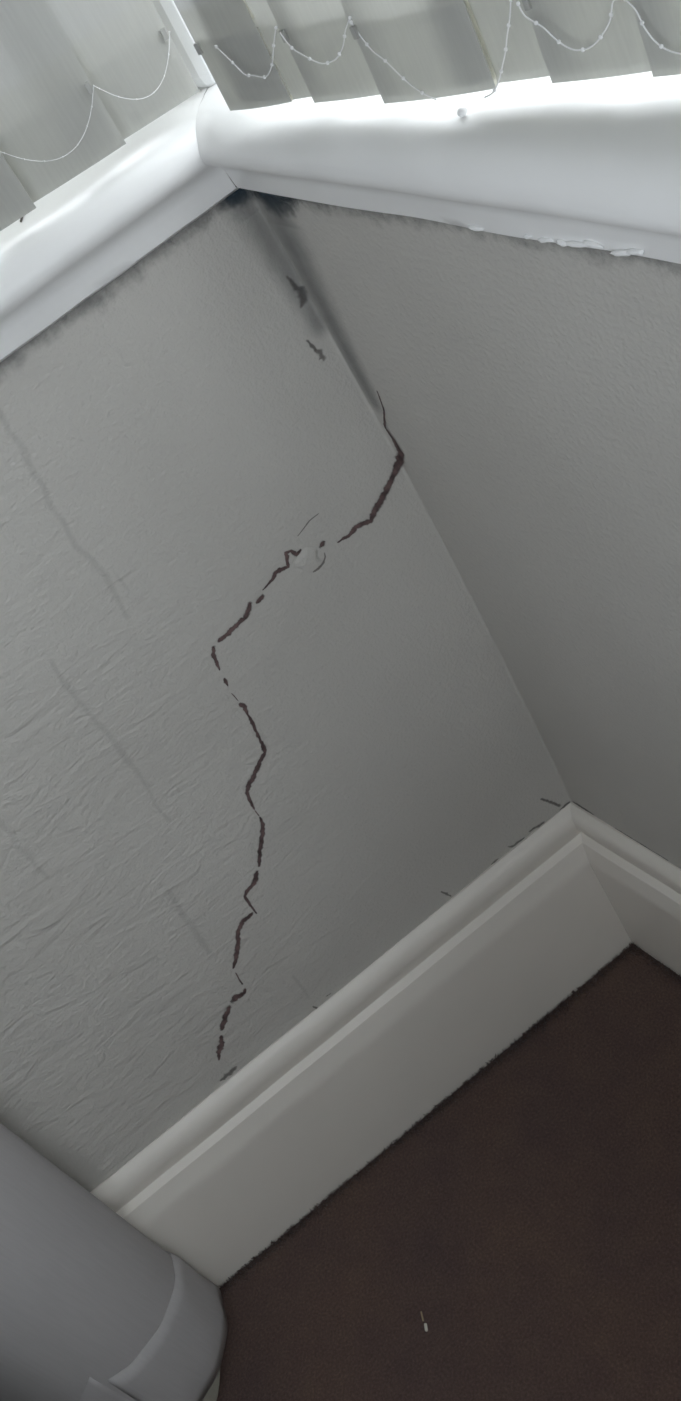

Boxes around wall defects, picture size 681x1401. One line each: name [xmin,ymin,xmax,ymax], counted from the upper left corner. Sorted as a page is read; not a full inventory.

crack [211,391,404,1060]